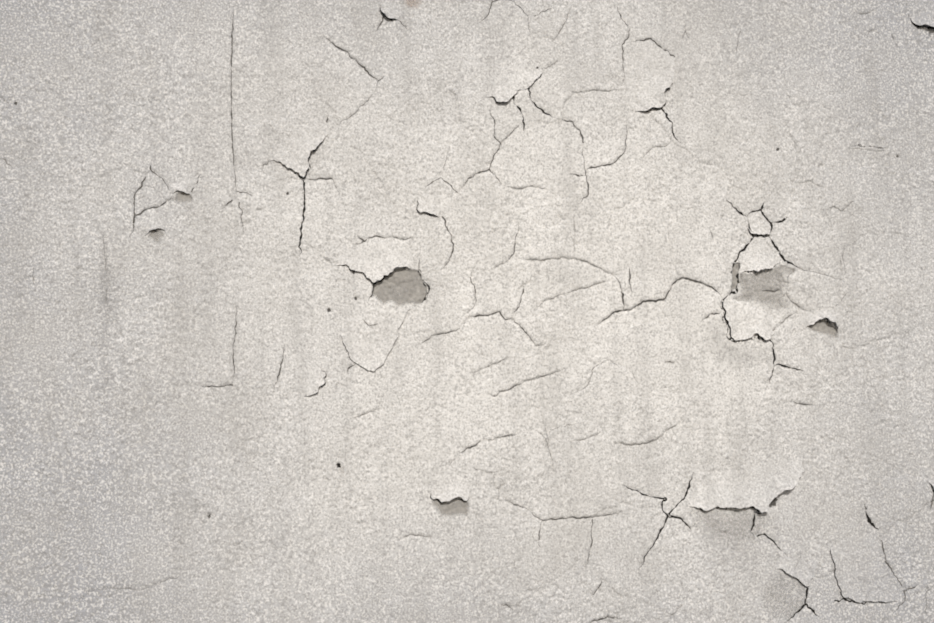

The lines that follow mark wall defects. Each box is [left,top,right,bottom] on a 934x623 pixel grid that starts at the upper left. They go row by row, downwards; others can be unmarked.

crack [222,14,251,223]
crack [557,118,666,200]
peeling [617,7,677,140]
peeling [906,0,934,39]
peeling [335,239,430,372]
crack [422,225,721,346]
peeling [721,212,843,364]
crack [727,200,847,310]
peeling [430,473,471,515]
crack [446,420,682,595]
crack [624,472,694,565]
peeling [688,457,805,514]